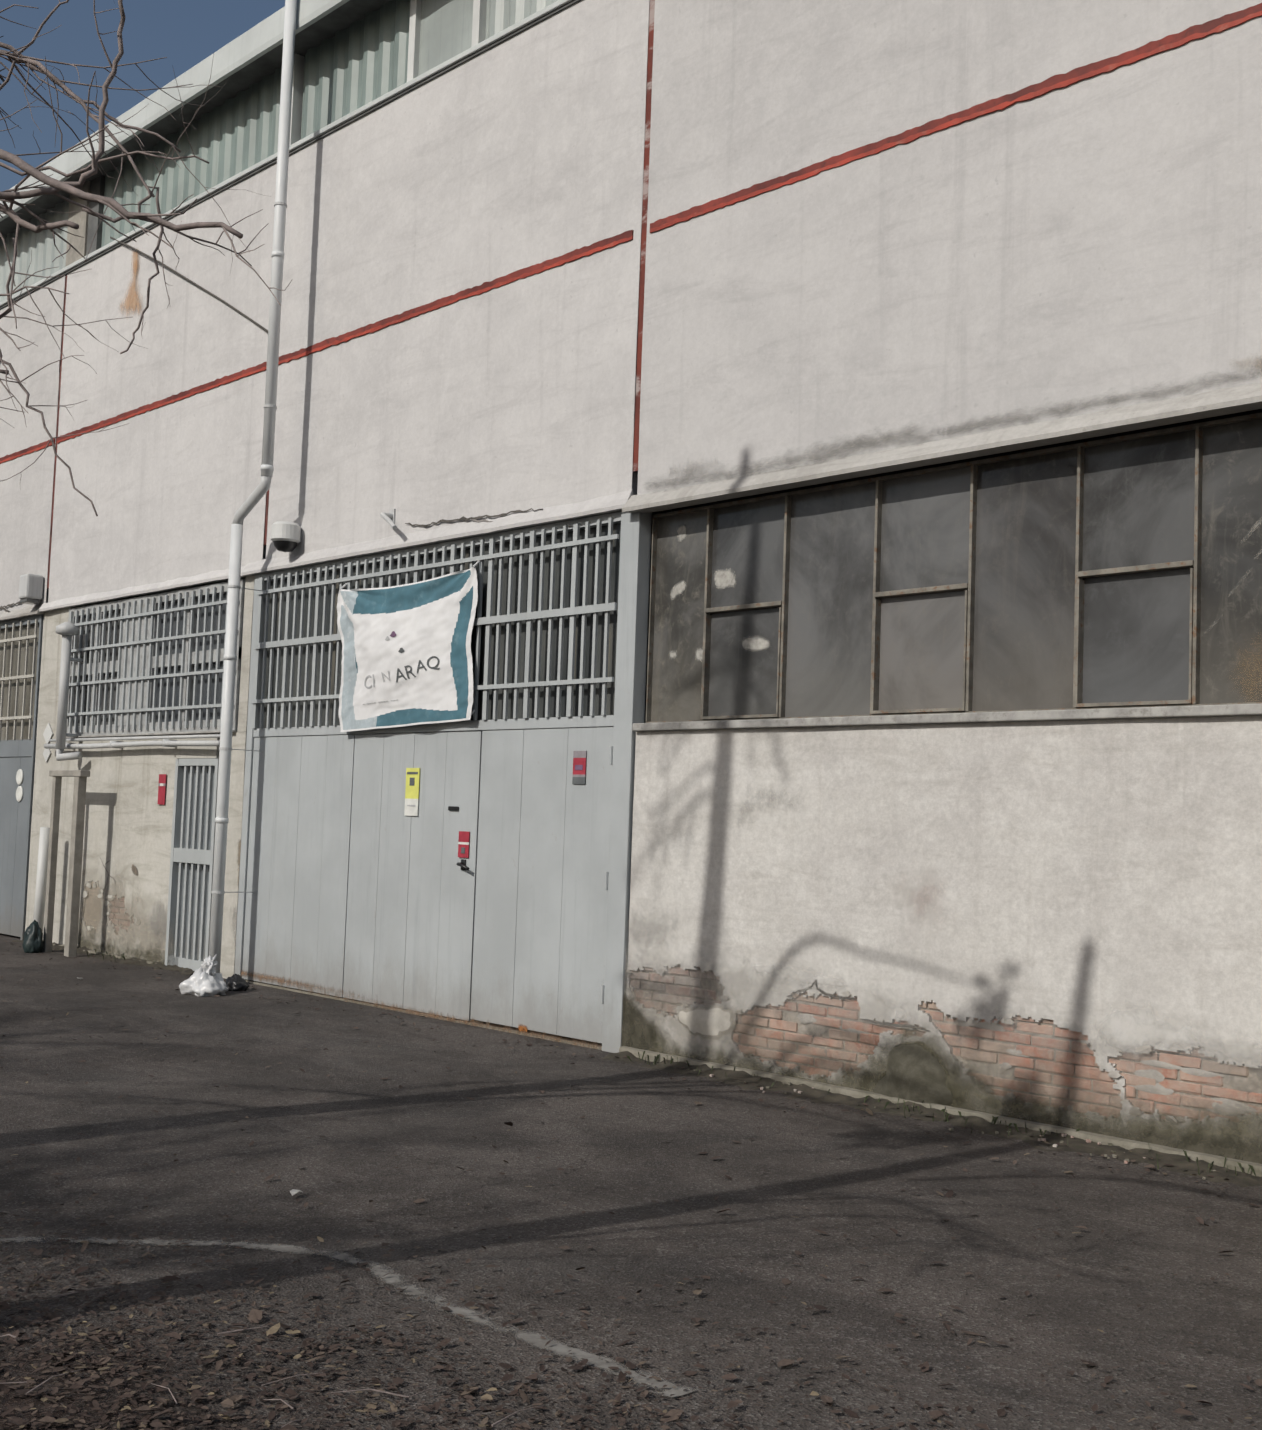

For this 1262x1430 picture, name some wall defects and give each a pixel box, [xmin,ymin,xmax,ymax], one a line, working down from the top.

rust [121,251,141,311]
water stain [787,431,910,462]
water stain [621,997,1262,1164]
flaking render [626,964,1262,1124]